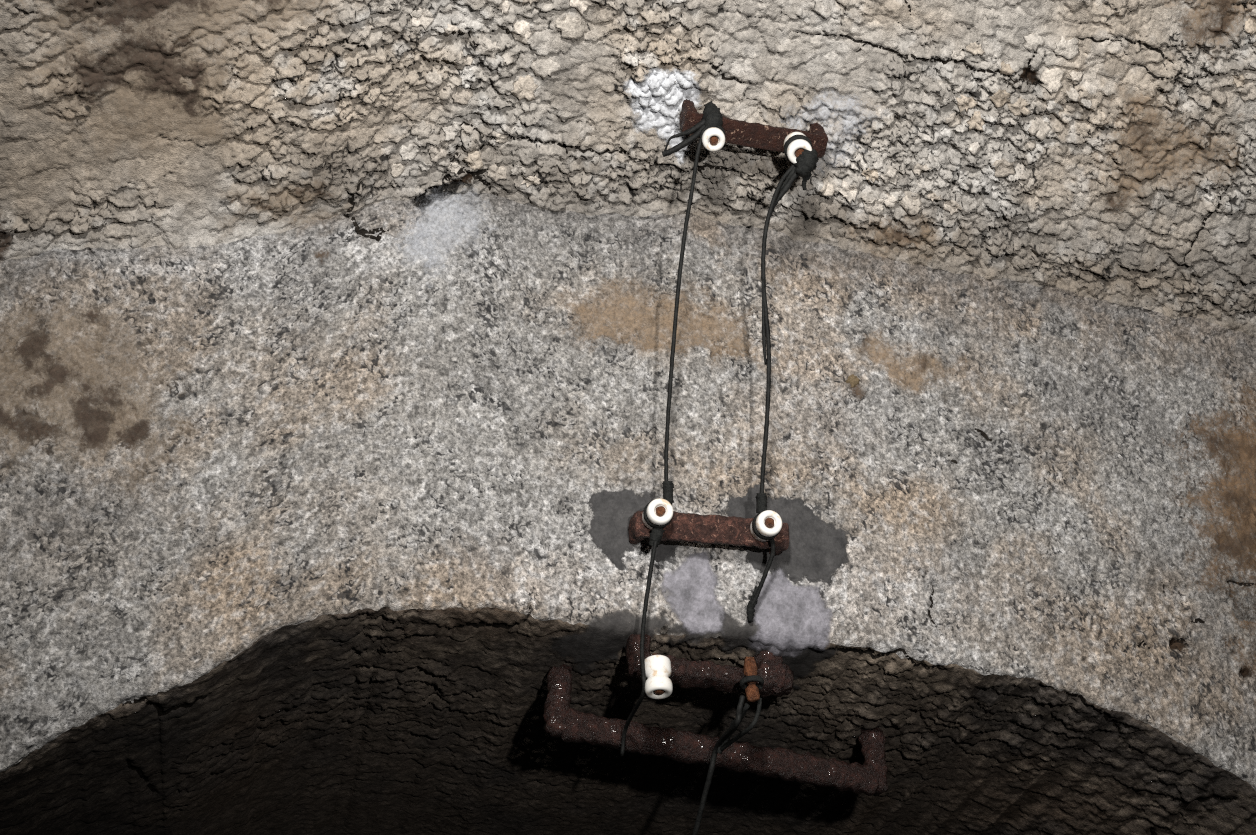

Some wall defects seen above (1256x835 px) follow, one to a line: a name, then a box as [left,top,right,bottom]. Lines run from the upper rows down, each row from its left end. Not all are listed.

leakage [60,0,214,116]
crack [797,32,1036,85]
crack [1078,36,1220,92]
crack [414,121,766,201]
crack [344,181,389,242]
crack [1184,179,1234,262]
leakage [17,331,69,398]
leakage [0,408,57,441]
leakage [71,384,149,451]